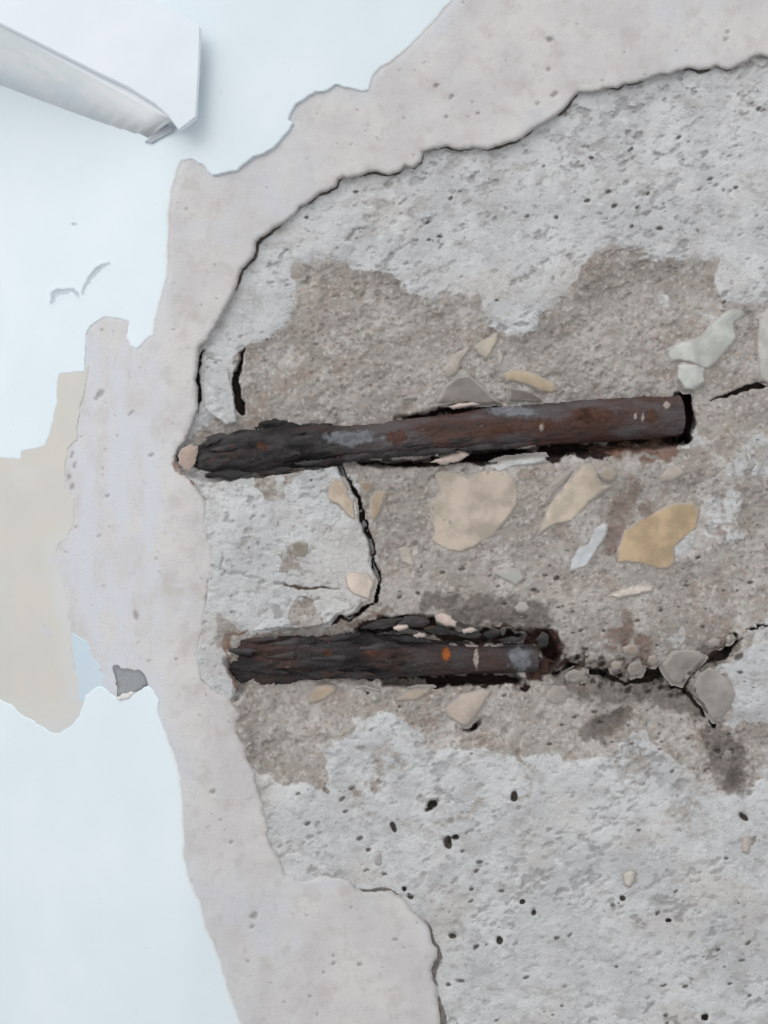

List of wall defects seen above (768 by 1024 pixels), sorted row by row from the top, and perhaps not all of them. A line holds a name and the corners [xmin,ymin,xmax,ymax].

crack [196,350,204,405]
crack [232,349,245,415]
corrosion [357,457,439,468]
corrosion [402,405,496,420]
corrosion [459,392,694,466]
peeling [0,366,89,733]
crack [332,466,381,625]
spalling [176,55,768,1024]
peeling [72,633,111,701]
spalling [112,665,148,697]
corrosion [355,614,579,692]
crack [552,624,767,728]